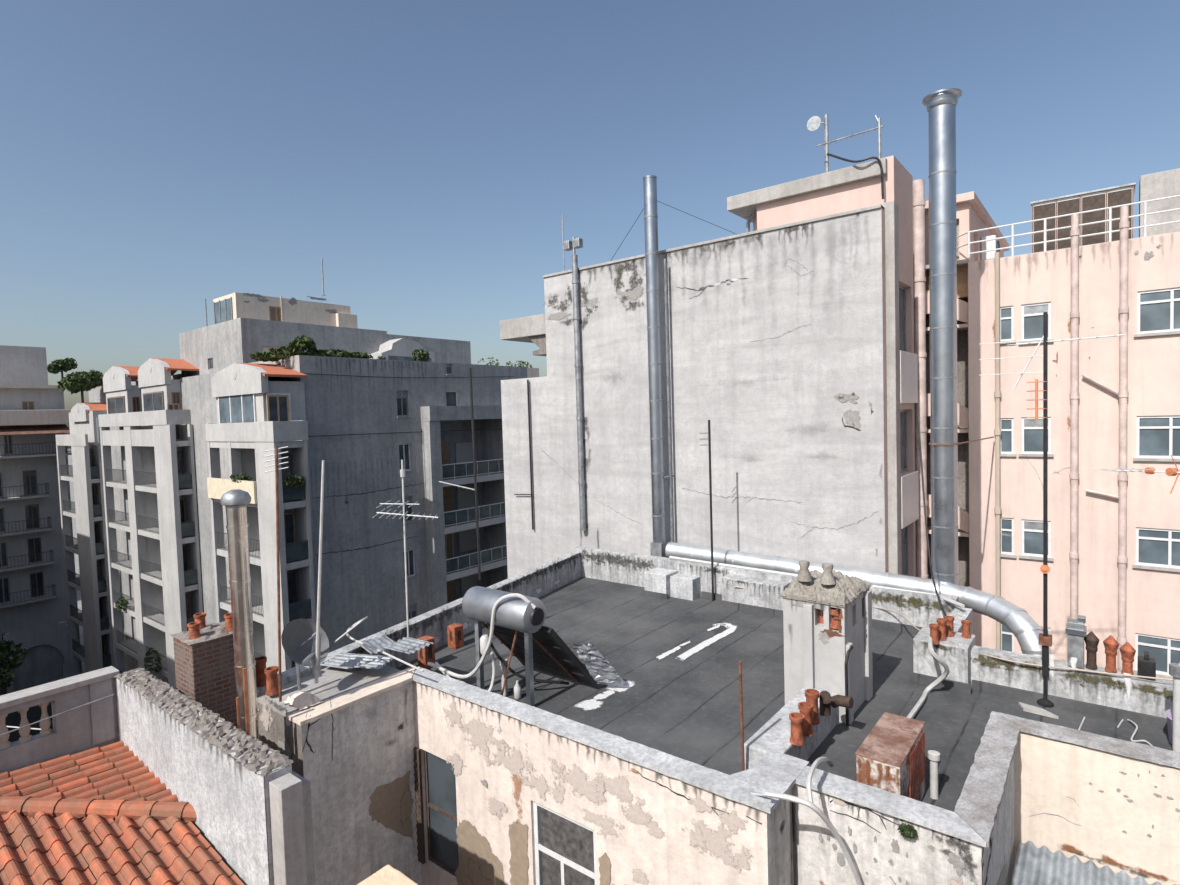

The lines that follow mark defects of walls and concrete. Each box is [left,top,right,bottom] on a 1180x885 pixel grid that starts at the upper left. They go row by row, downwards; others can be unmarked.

leakage [668,233,761,256]
crack [678,278,748,299]
flaking render [834,393,873,431]
leakage [1068,657,1109,687]
leakage [1124,673,1132,700]
peeling [443,702,665,838]
rust [857,758,899,788]
peeling [632,869,648,885]
peeling [682,796,752,873]
flaking render [819,826,857,866]
flaking render [866,839,909,885]
crack [981,837,994,885]